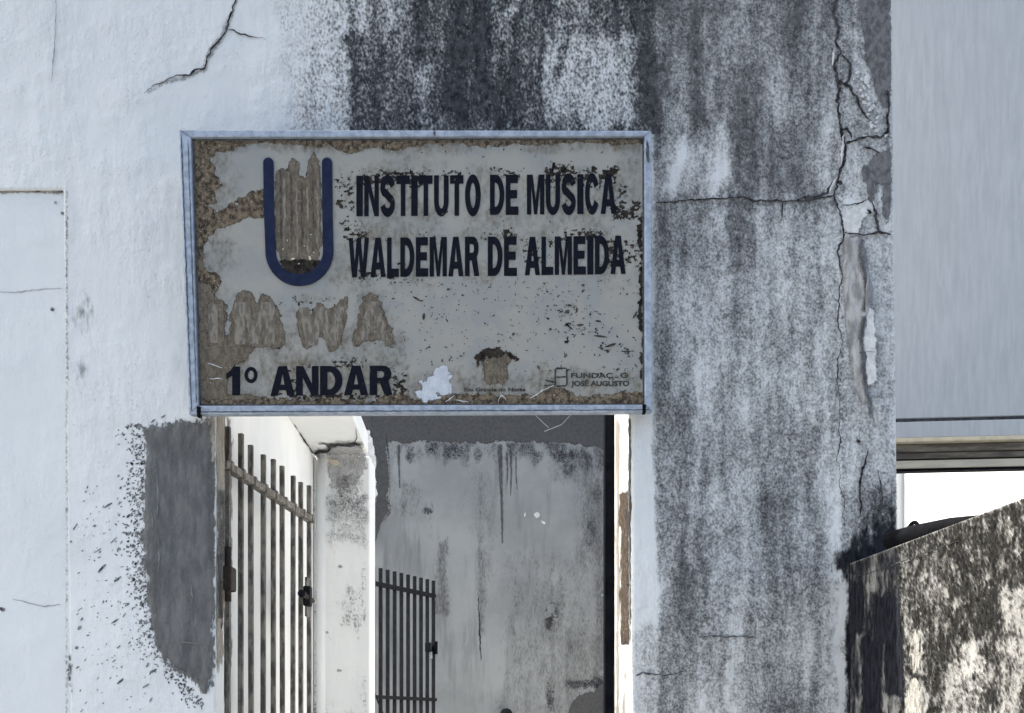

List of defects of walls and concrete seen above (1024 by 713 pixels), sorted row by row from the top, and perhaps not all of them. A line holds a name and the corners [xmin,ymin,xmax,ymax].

crack [148,0,263,90]
spalling [842,0,892,233]
water stain [300,0,957,713]
crack [655,0,891,527]
peeling [863,308,878,385]
peeling [70,415,204,709]
peeling [618,490,631,645]